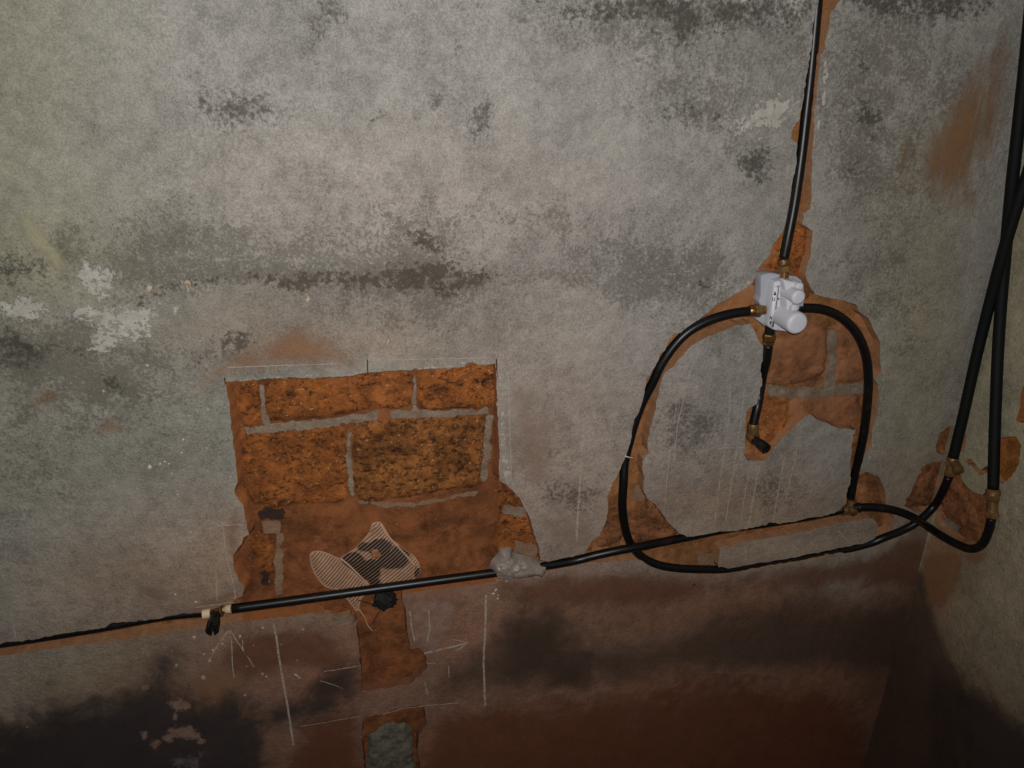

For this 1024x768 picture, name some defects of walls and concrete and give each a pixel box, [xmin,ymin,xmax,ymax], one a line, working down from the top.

damp [0,219,197,355]
damp [249,230,498,303]
flaking render [636,0,894,575]
flaking render [0,359,642,691]
flaking render [904,426,1021,545]
damp [0,623,360,768]
spalling [362,706,427,768]
damp [795,542,1024,768]